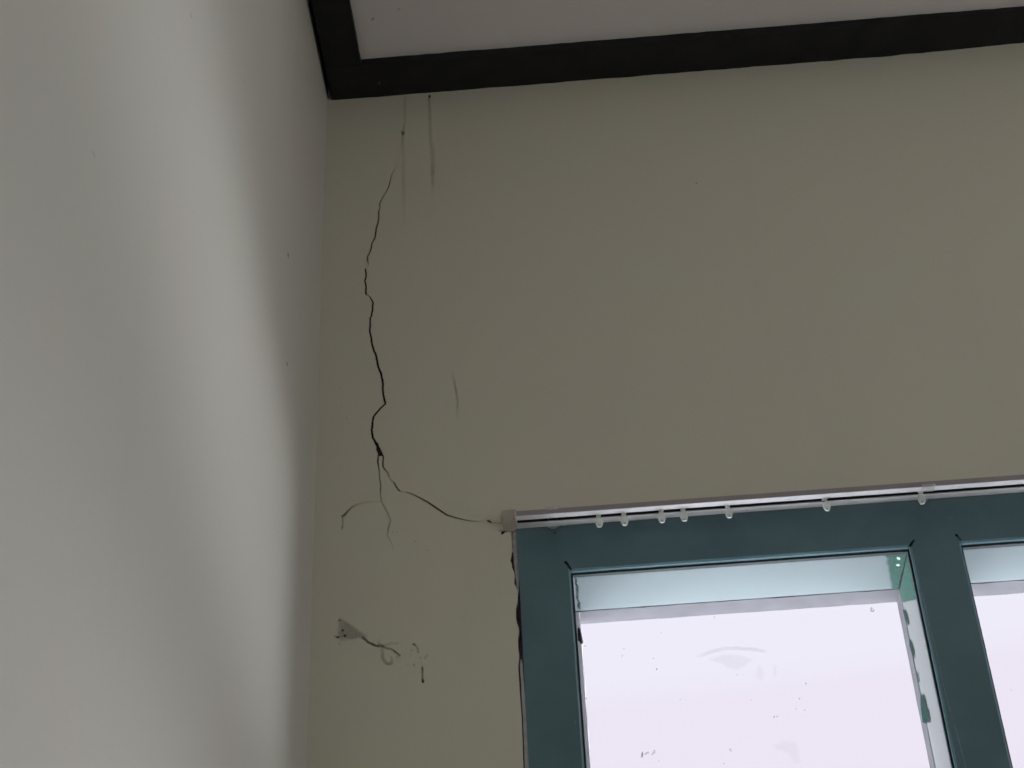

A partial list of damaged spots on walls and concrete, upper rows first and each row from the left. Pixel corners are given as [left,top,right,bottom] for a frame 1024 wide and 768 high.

crack [364,180,492,523]